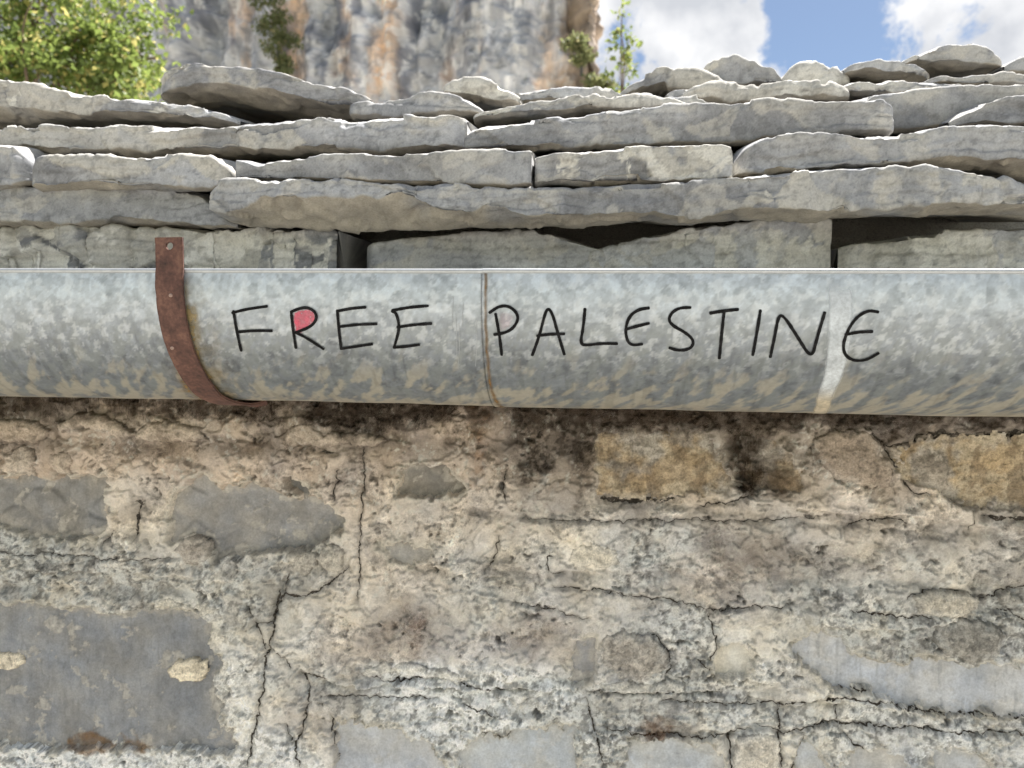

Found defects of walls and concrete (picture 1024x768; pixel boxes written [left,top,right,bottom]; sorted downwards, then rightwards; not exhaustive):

damp [0,291,954,497]
damp [967,416,1006,430]
crack [870,428,1024,495]
spalling [0,474,111,539]
spalling [171,475,346,559]
crack [525,494,906,526]
crack [968,515,1024,528]
crack [247,448,439,766]
spalling [0,598,238,751]
spalling [792,631,1024,717]
crack [461,681,528,738]